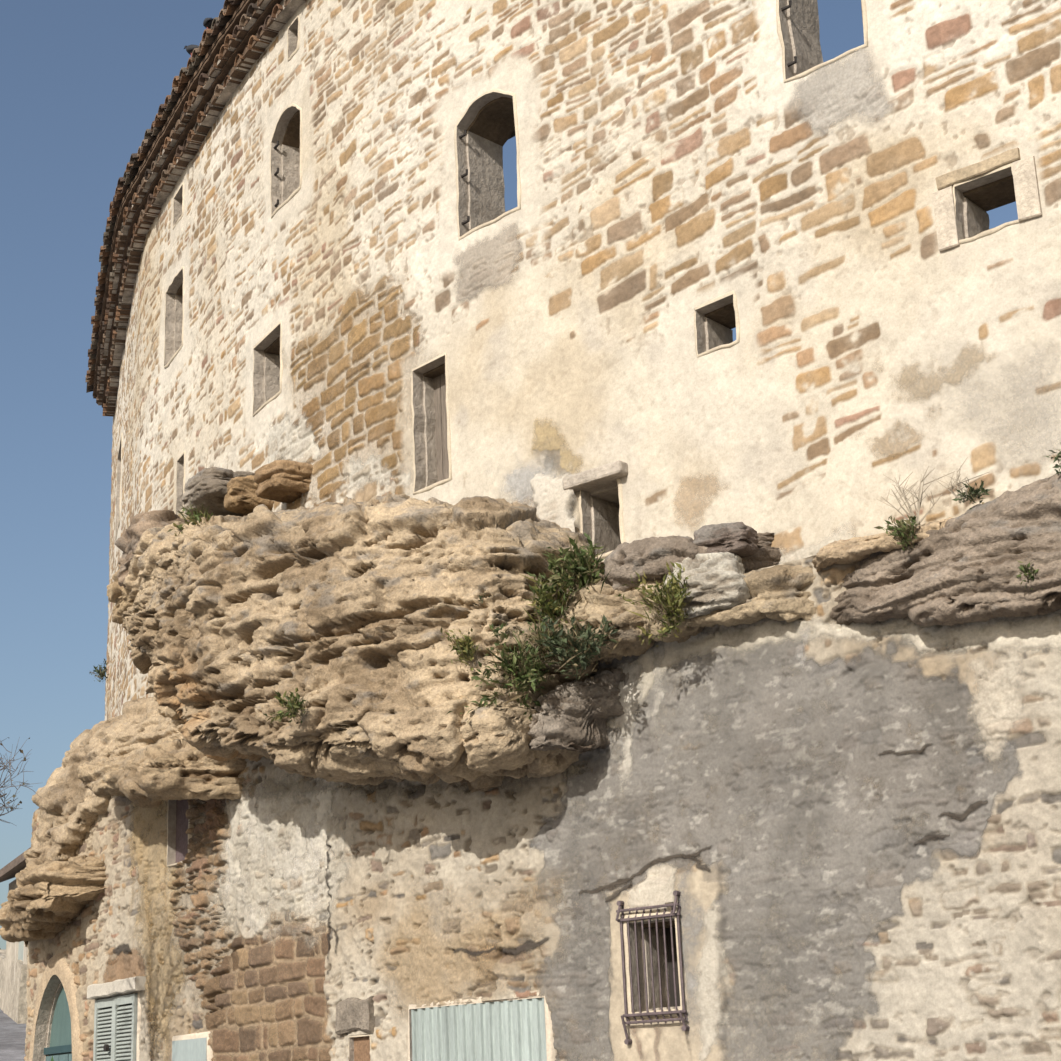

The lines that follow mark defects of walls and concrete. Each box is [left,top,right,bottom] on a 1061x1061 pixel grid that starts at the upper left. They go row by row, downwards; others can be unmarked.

flaking render [174,773,356,1061]
crack [325,836,338,974]
crack [579,846,711,902]
leakage [390,612,1061,1061]